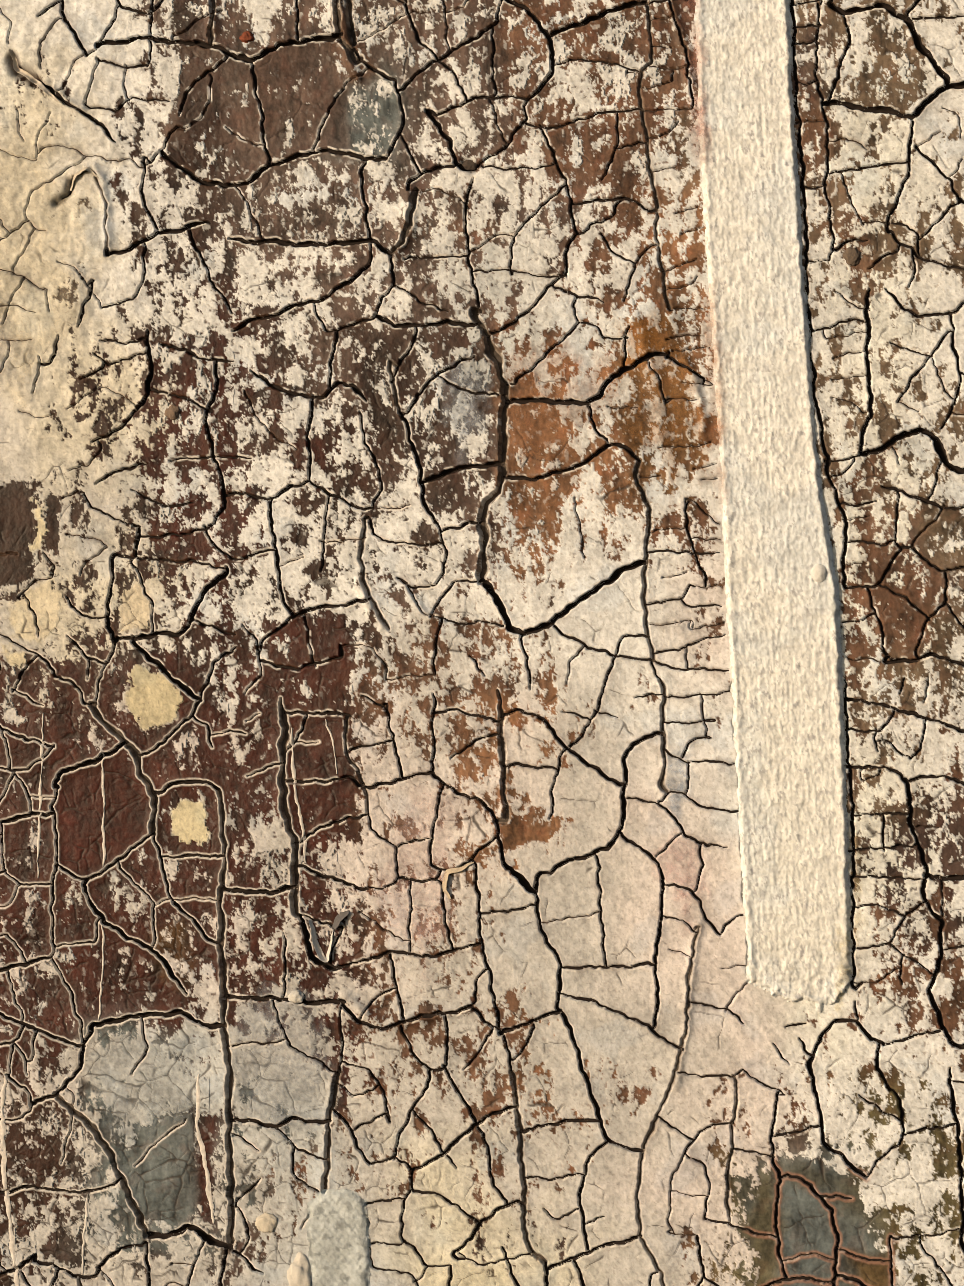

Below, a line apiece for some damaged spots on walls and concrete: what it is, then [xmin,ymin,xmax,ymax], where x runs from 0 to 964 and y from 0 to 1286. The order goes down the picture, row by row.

crack [0,294,36,324]
crack [0,185,50,312]
peeling [0,480,64,600]
peeling [142,322,240,585]
crack [36,0,729,723]
peeling [163,0,693,243]
peeling [352,323,579,540]
crack [790,0,964,667]
peeling [829,0,928,110]
peeling [244,610,359,990]
crack [0,331,964,1286]
peeling [0,634,234,1286]